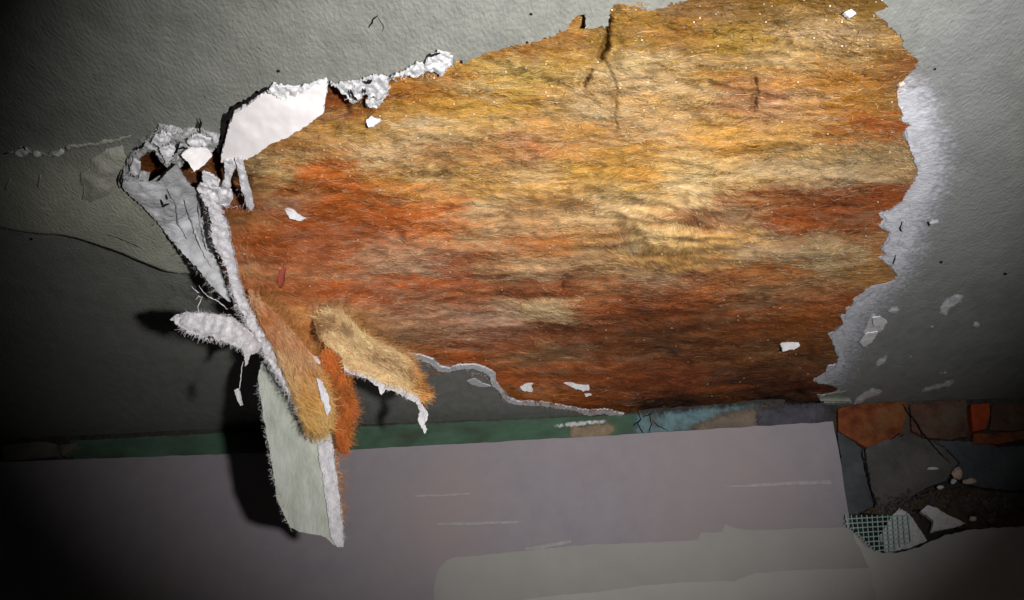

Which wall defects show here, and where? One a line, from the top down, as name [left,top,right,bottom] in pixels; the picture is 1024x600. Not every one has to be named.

flaking render [366,116,381,128]
flaking render [119,70,328,212]
flaking render [285,208,308,221]
peeling [858,307,899,347]
flaking render [780,342,800,352]
peeling [467,378,492,387]
flaking render [564,382,592,397]
peeling [854,388,882,404]
peeling [558,420,614,438]
crack [903,404,951,464]
crack [862,448,876,505]